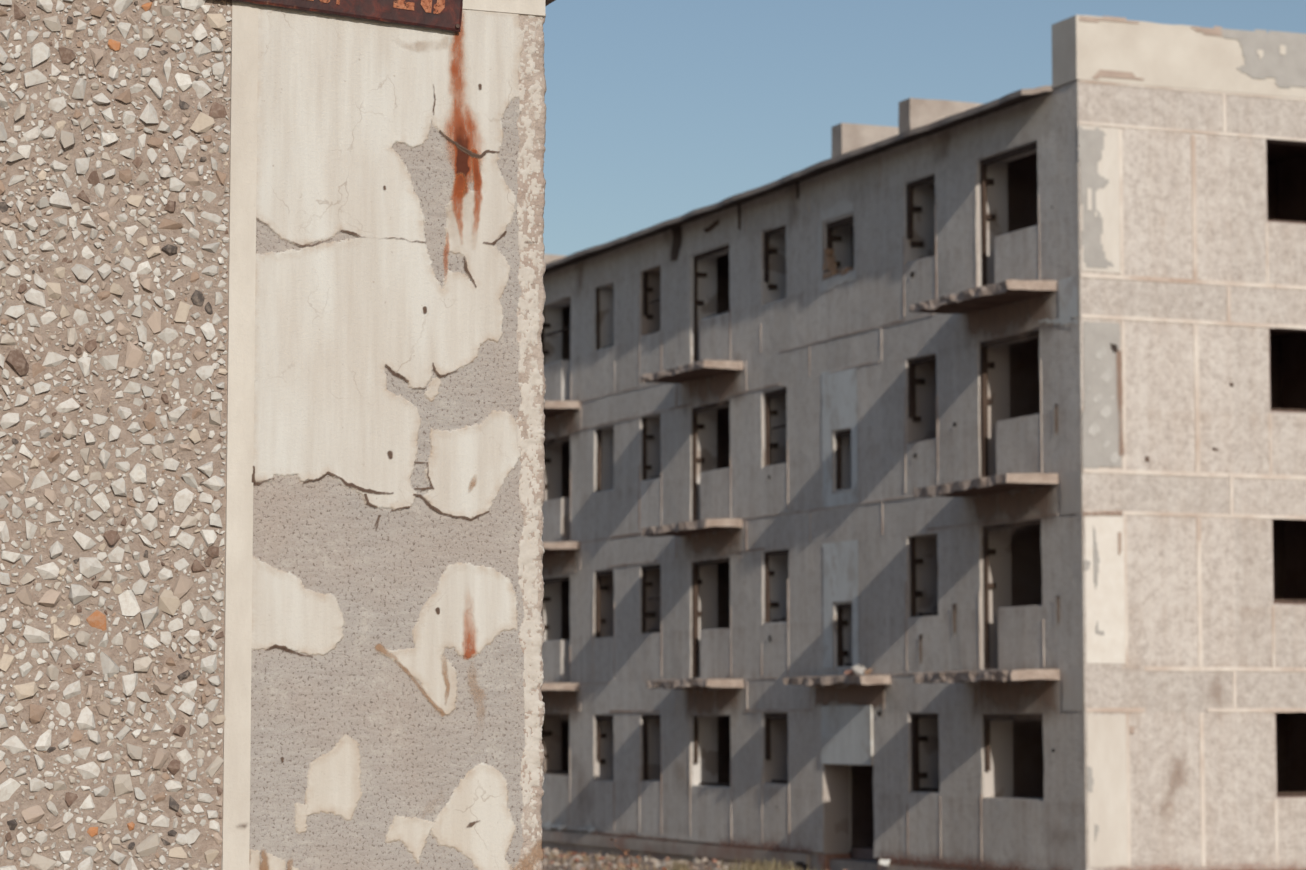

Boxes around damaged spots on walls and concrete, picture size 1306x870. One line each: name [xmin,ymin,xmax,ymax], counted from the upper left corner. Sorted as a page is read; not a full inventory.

corrosion [448,20,482,228]
peeling [1191,26,1306,88]
peeling [1078,126,1114,269]
peeling [249,14,608,870]
corrosion [464,631,476,659]